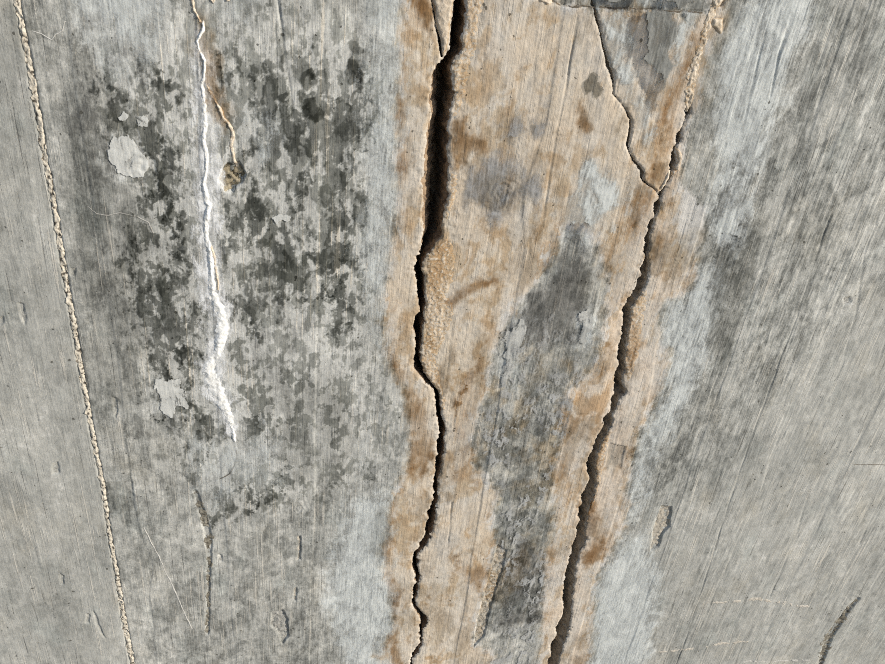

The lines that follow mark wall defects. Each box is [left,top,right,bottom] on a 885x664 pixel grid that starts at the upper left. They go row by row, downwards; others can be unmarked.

damp [260,78,311,162]
damp [130,253,164,319]
damp [145,0,245,479]
damp [253,209,295,274]
damp [317,213,387,311]
crack [410,0,484,664]
crack [547,0,690,664]